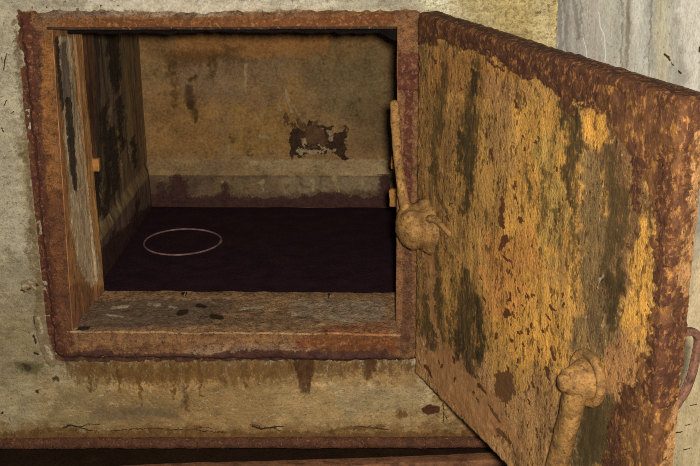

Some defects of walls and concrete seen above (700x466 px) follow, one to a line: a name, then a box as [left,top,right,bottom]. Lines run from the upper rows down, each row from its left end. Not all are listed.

corrosion [59,12,393,27]
damp [94,34,138,220]
peeling [283,113,349,160]
corrosion [398,50,420,203]
corrosion [418,11,700,466]
corrosion [58,335,416,412]